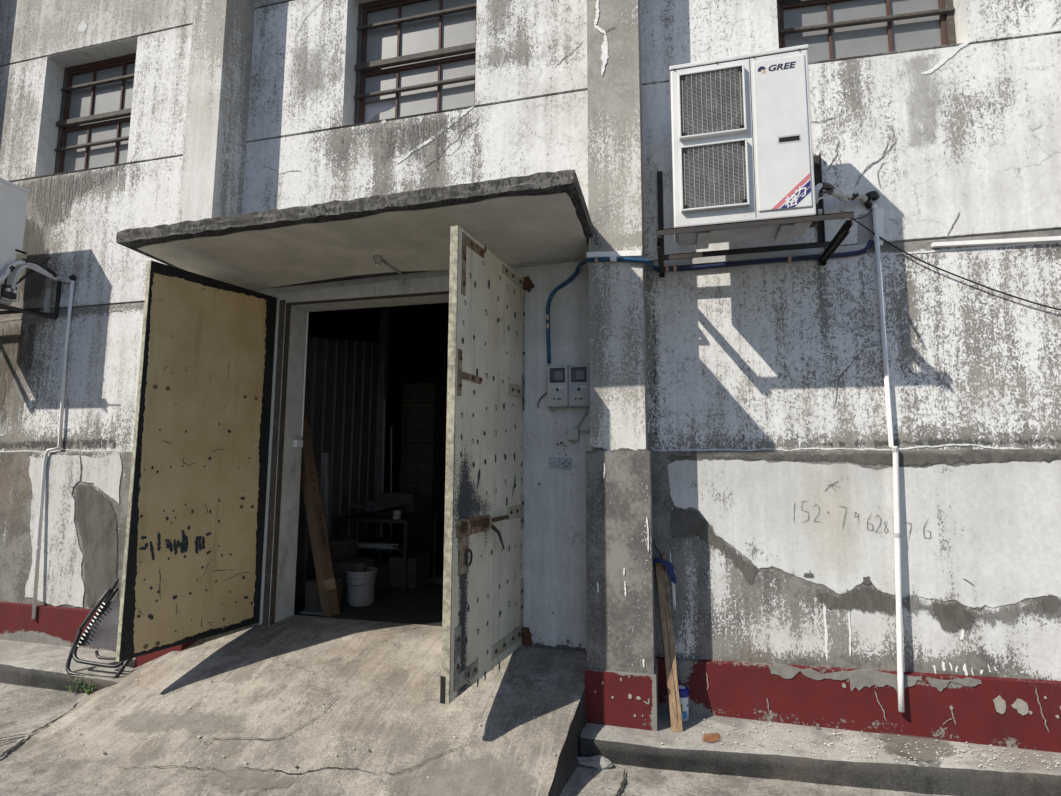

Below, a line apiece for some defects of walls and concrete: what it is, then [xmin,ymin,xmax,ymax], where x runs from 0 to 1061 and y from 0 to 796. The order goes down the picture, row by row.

peeling [667,459,1061,608]
peeling [769,664,982,693]